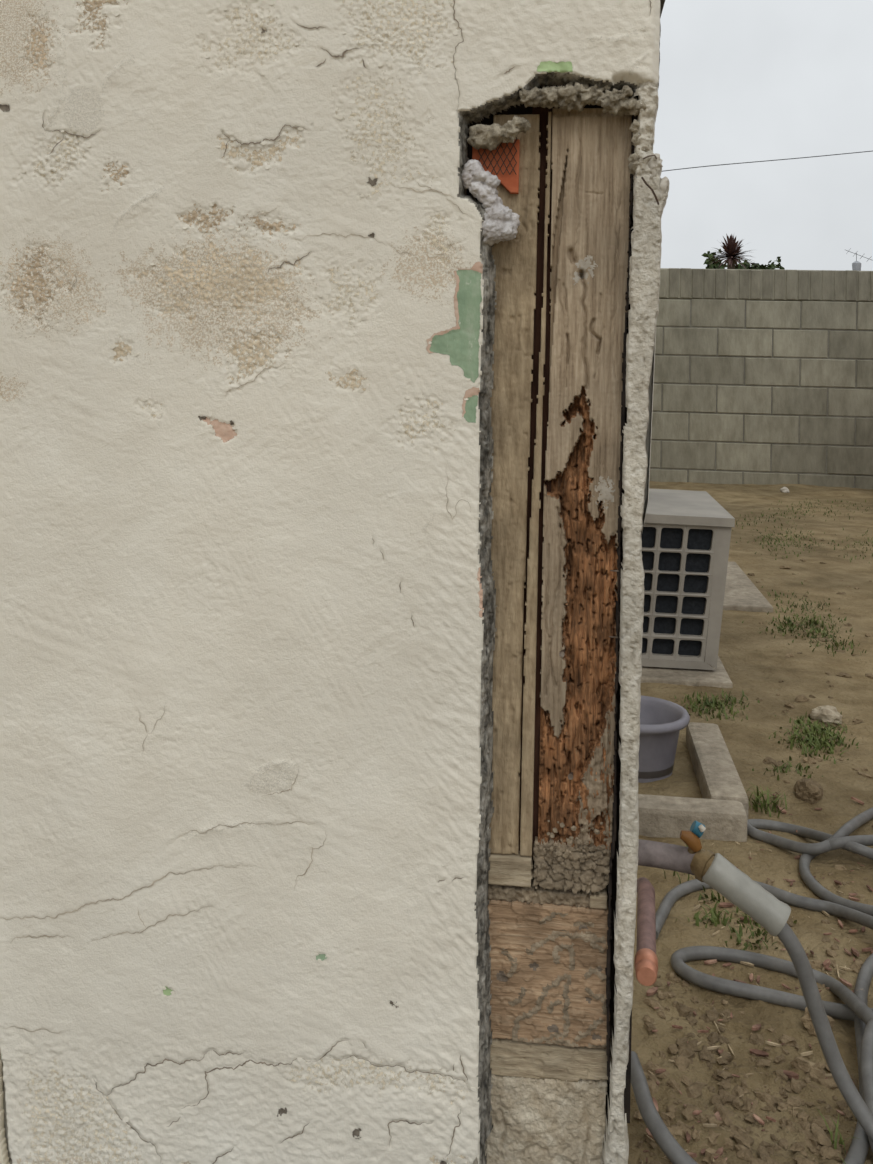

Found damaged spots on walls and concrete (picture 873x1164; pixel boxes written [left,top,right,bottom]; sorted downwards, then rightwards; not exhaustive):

crack [296,23,366,68]
crack [453,0,464,109]
peeling [198,415,237,442]
spalling [289,60,637,1164]
crack [179,769,326,889]
crack [4,865,238,942]
crack [93,1040,474,1157]